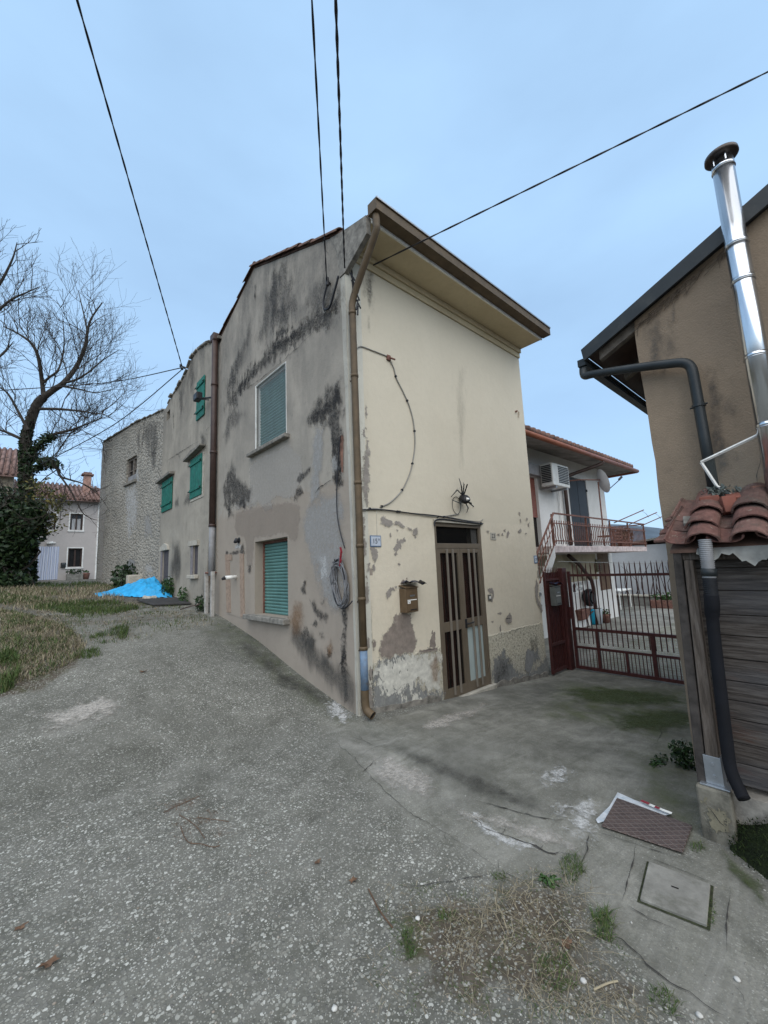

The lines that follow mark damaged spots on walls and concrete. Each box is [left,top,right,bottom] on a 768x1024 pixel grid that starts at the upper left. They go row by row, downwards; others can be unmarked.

water stain [226,270,338,434]
water stain [308,383,344,486]
water stain [223,468,250,517]
flaking render [380,516,418,565]
water stain [293,602,353,723]
flaking render [360,613,446,716]
flaking render [491,646,549,684]
crack [338,738,730,942]